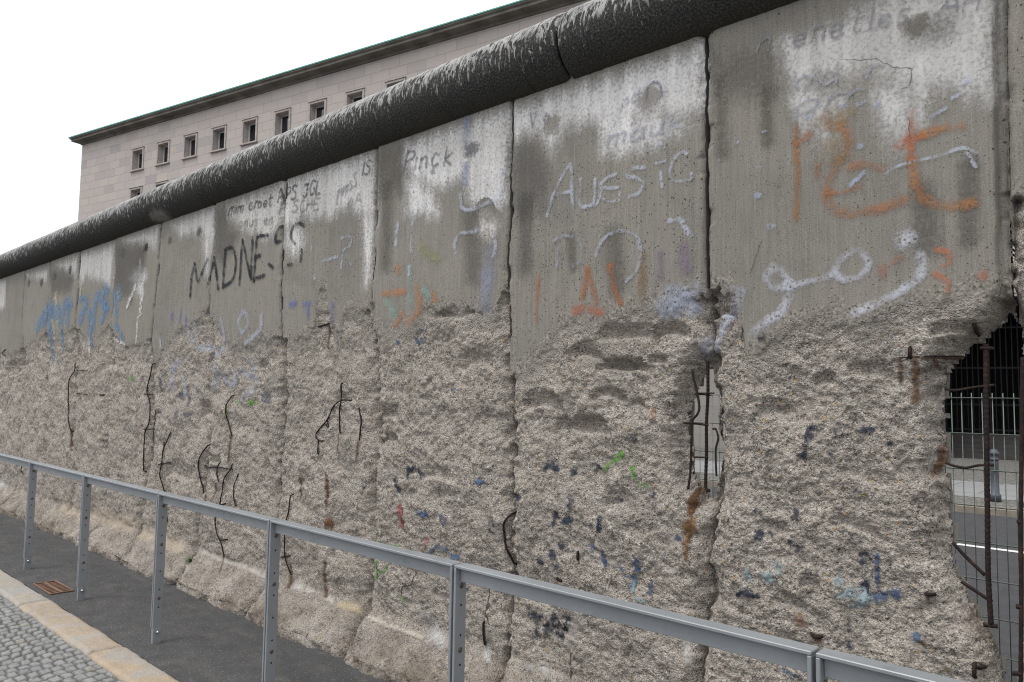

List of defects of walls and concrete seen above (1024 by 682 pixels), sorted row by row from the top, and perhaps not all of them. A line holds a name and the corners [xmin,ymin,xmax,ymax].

corrosion [893,357,964,402]
spalling [0,193,1024,682]
corrosion [683,487,705,560]